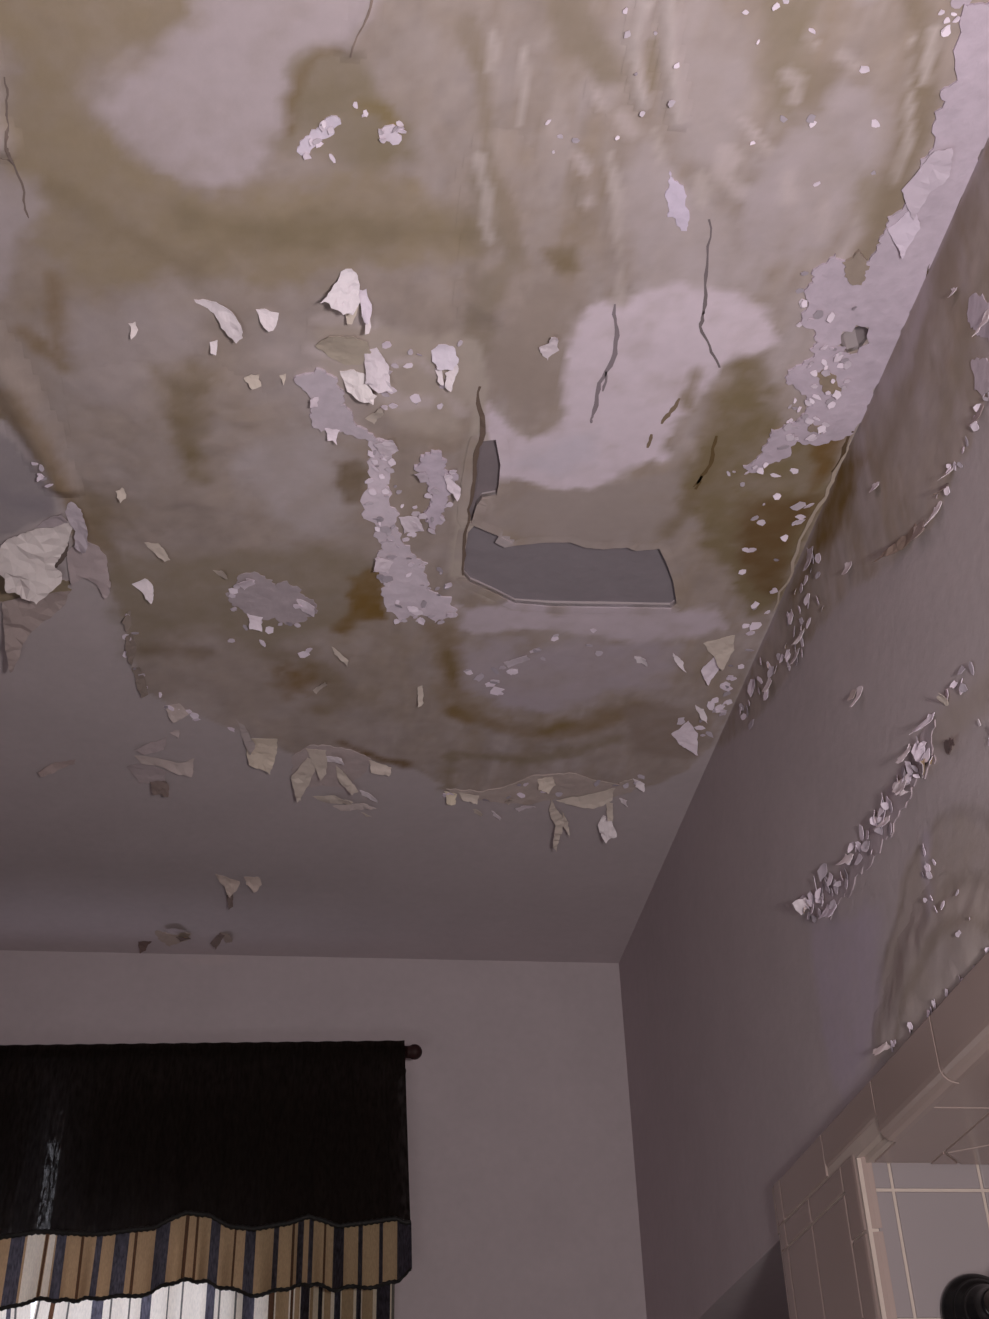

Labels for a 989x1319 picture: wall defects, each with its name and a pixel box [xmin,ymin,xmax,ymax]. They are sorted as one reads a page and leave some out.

crack [350,0,373,58]
crack [0,77,29,218]
peeling [297,115,341,163]
peeling [194,299,243,355]
flaking render [279,269,687,657]
damp [0,0,989,797]
crack [590,304,620,423]
crack [699,219,720,368]
peeling [727,0,989,487]
peeling [0,502,111,673]
peeling [213,570,318,647]
peeling [792,661,974,923]